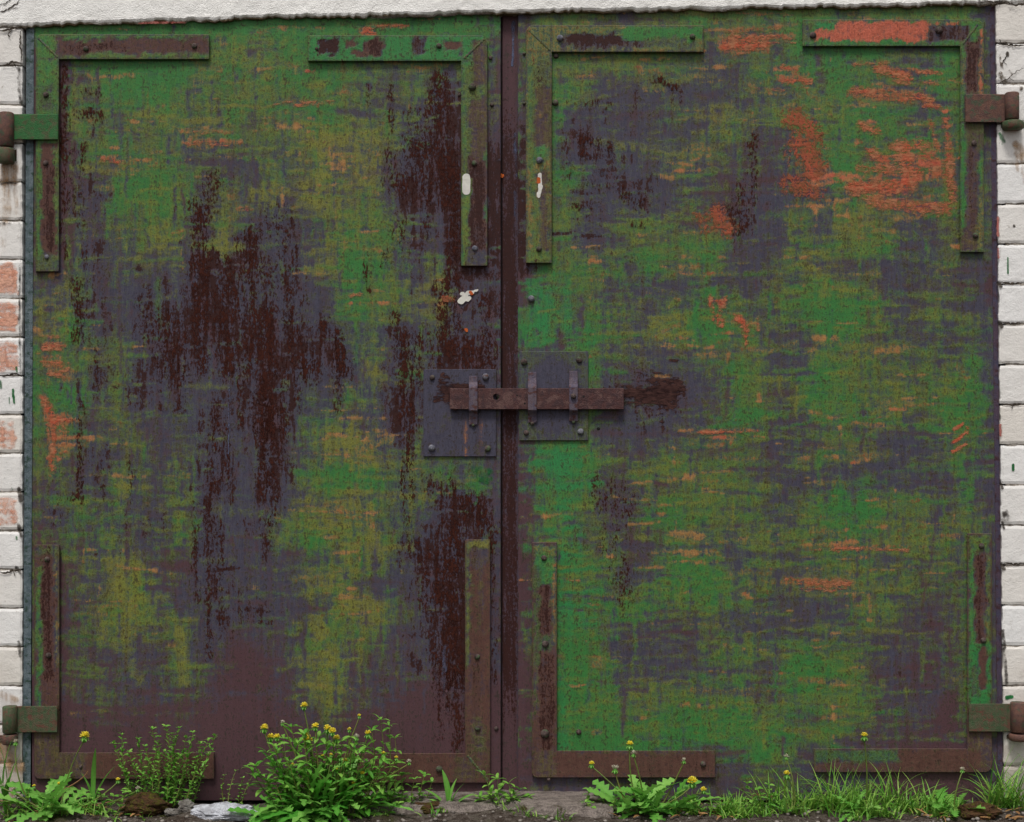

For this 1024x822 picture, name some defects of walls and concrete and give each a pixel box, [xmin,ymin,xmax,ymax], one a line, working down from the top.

peeling [0,262,21,371]
peeling [0,421,17,449]
peeling [0,487,23,537]